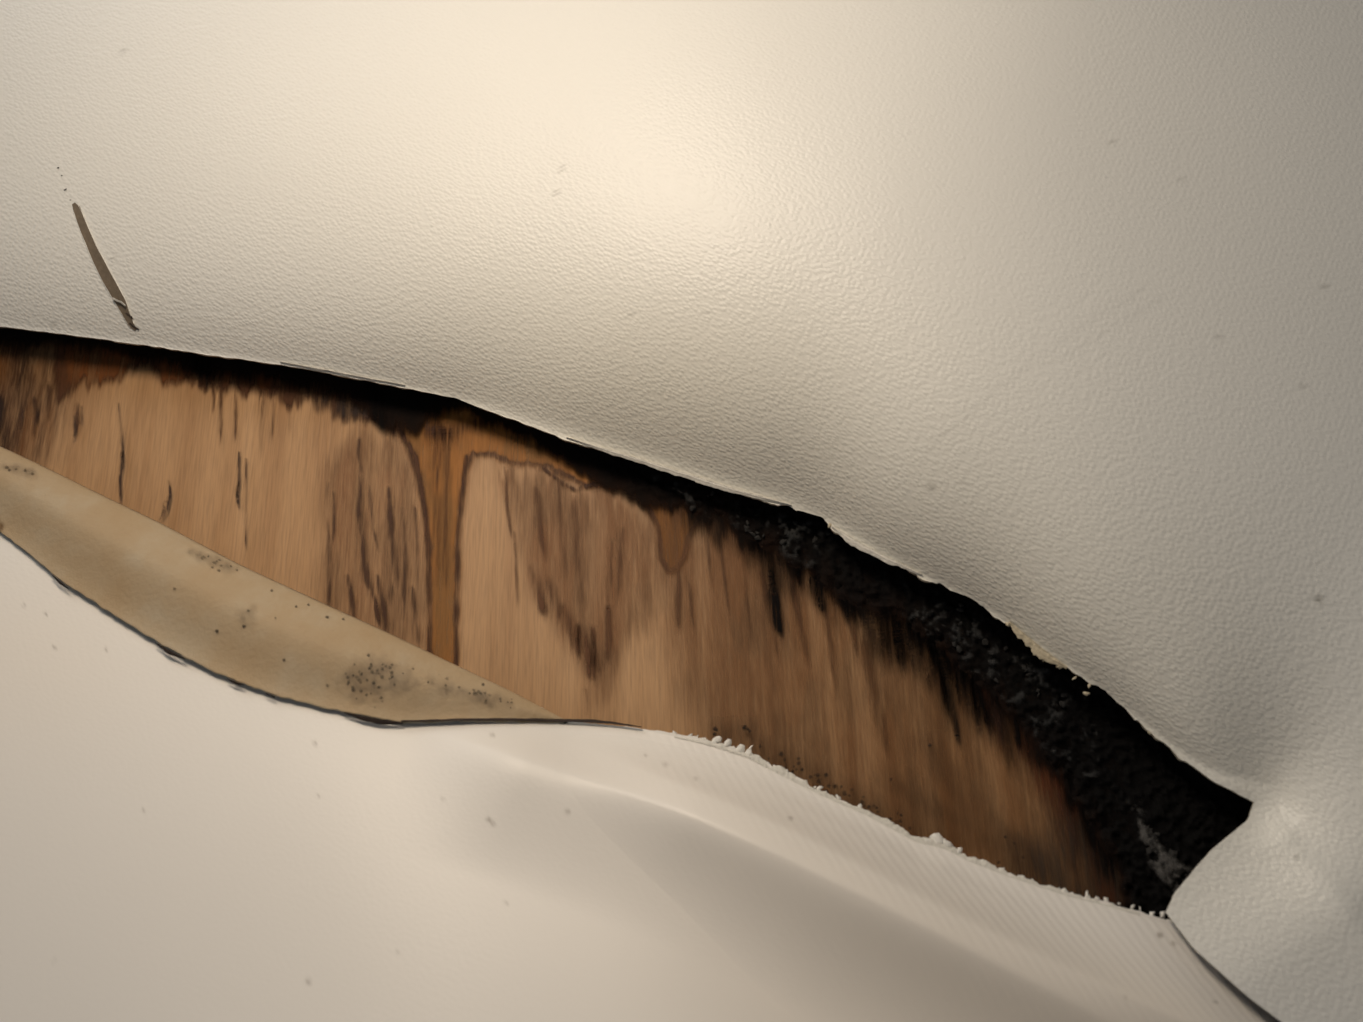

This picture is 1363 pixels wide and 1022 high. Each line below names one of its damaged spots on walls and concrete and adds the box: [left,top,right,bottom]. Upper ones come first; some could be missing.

peeling [0,446,642,727]
damp [0,328,1253,920]
peeling [672,731,841,800]
peeling [924,833,963,854]
peeling [1085,891,1166,918]